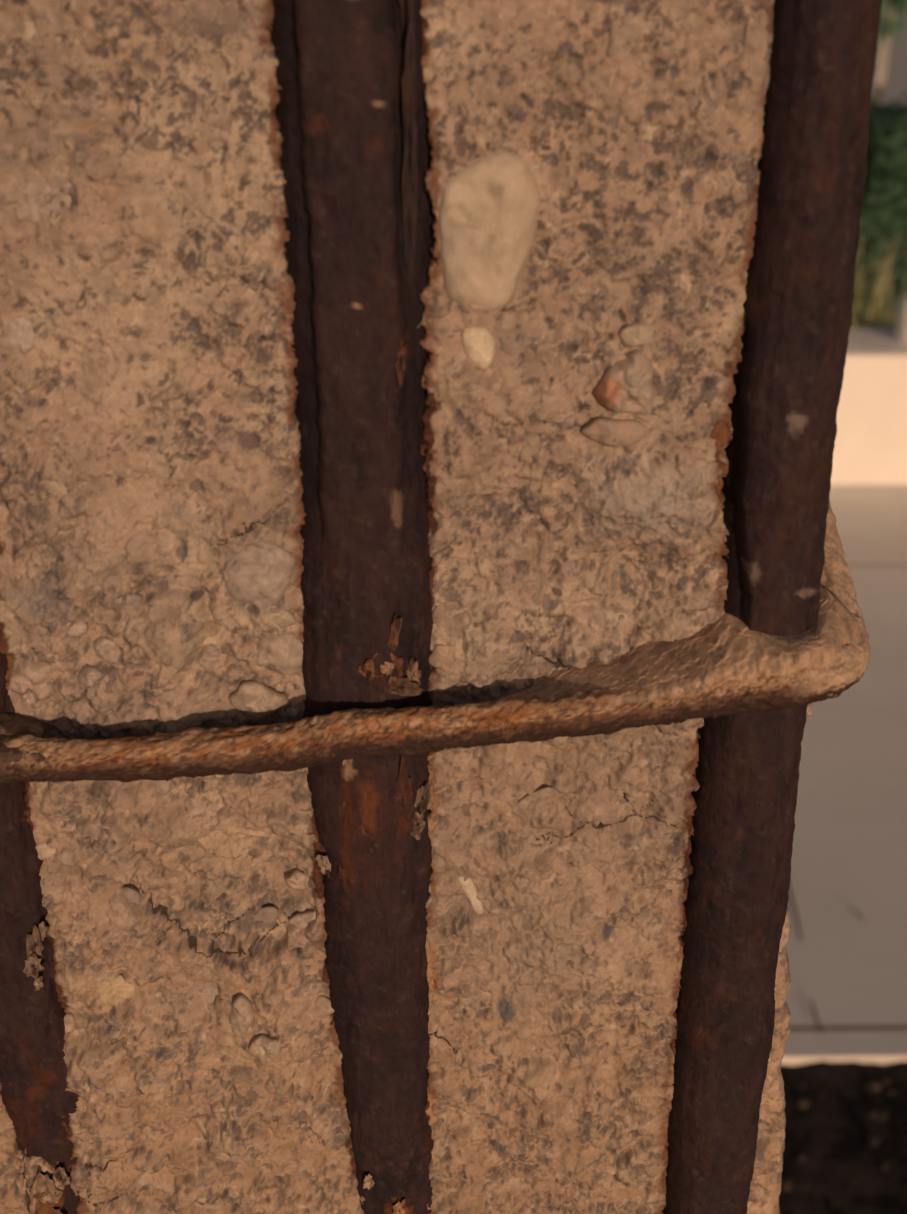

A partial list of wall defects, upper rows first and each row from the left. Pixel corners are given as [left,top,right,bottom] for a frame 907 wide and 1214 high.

rust [419,393,438,534]
rust [711,420,731,502]
rust [358,613,436,696]
rust [308,814,357,899]
rust [394,755,441,840]
crack [536,789,682,846]
crack [131,876,285,958]
rust [23,921,68,1009]
rust [425,937,442,1006]
rust [425,1093,438,1140]
rust [29,1152,75,1214]
rust [345,1140,375,1190]